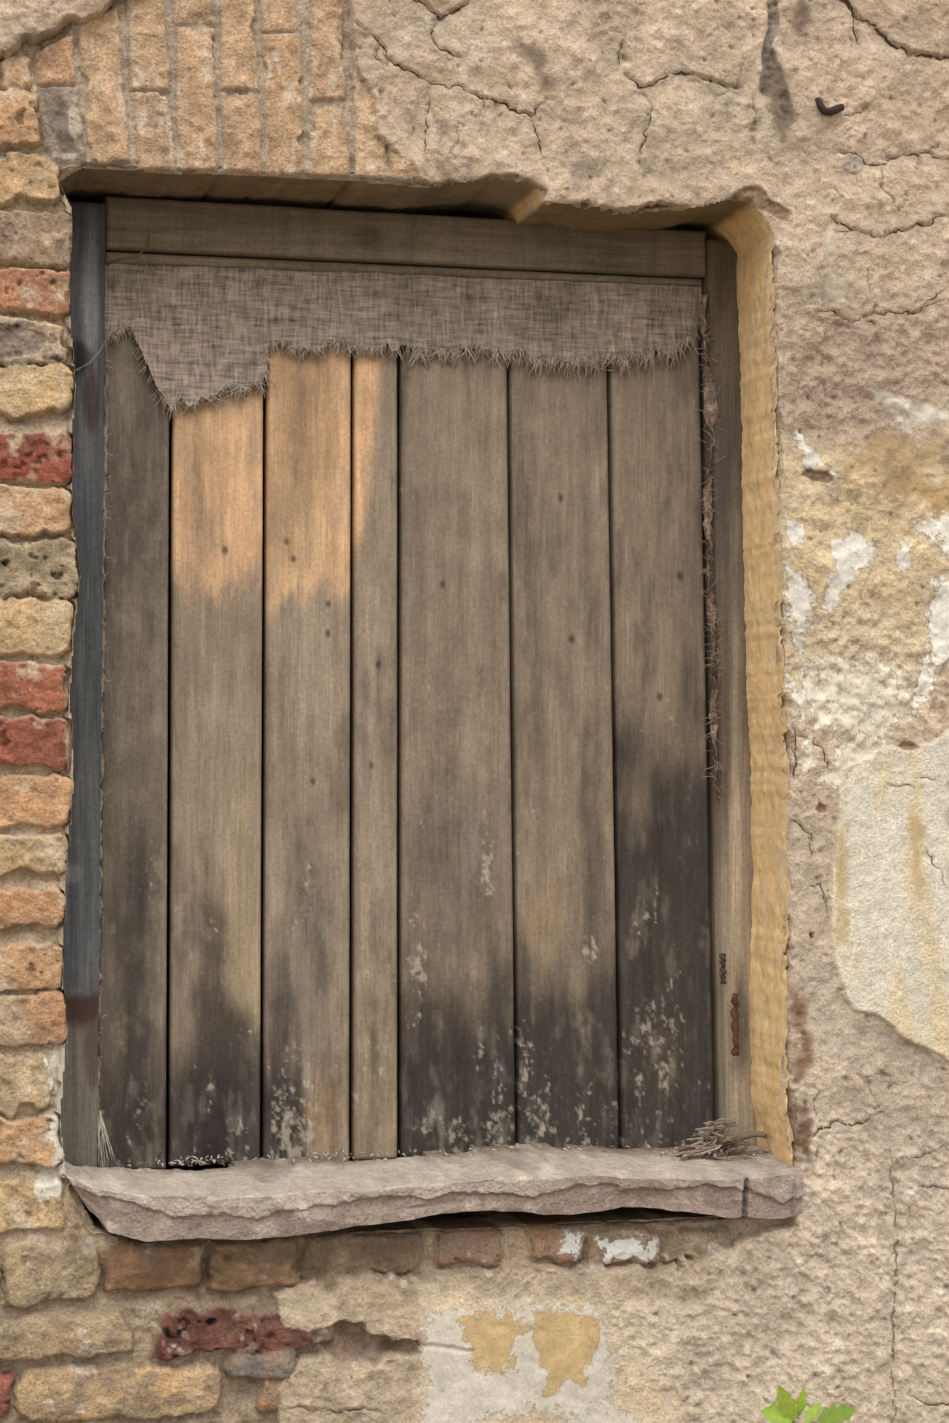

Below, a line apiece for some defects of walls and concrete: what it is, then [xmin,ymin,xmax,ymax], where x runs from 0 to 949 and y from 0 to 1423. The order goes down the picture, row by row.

crack [839,0,949,61]
crack [354,0,547,154]
crack [616,35,736,155]
crack [842,144,943,166]
crack [830,216,941,238]
crack [818,285,947,324]
peeling [790,429,837,481]
peeling [775,510,949,797]
peeling [308,1293,665,1423]